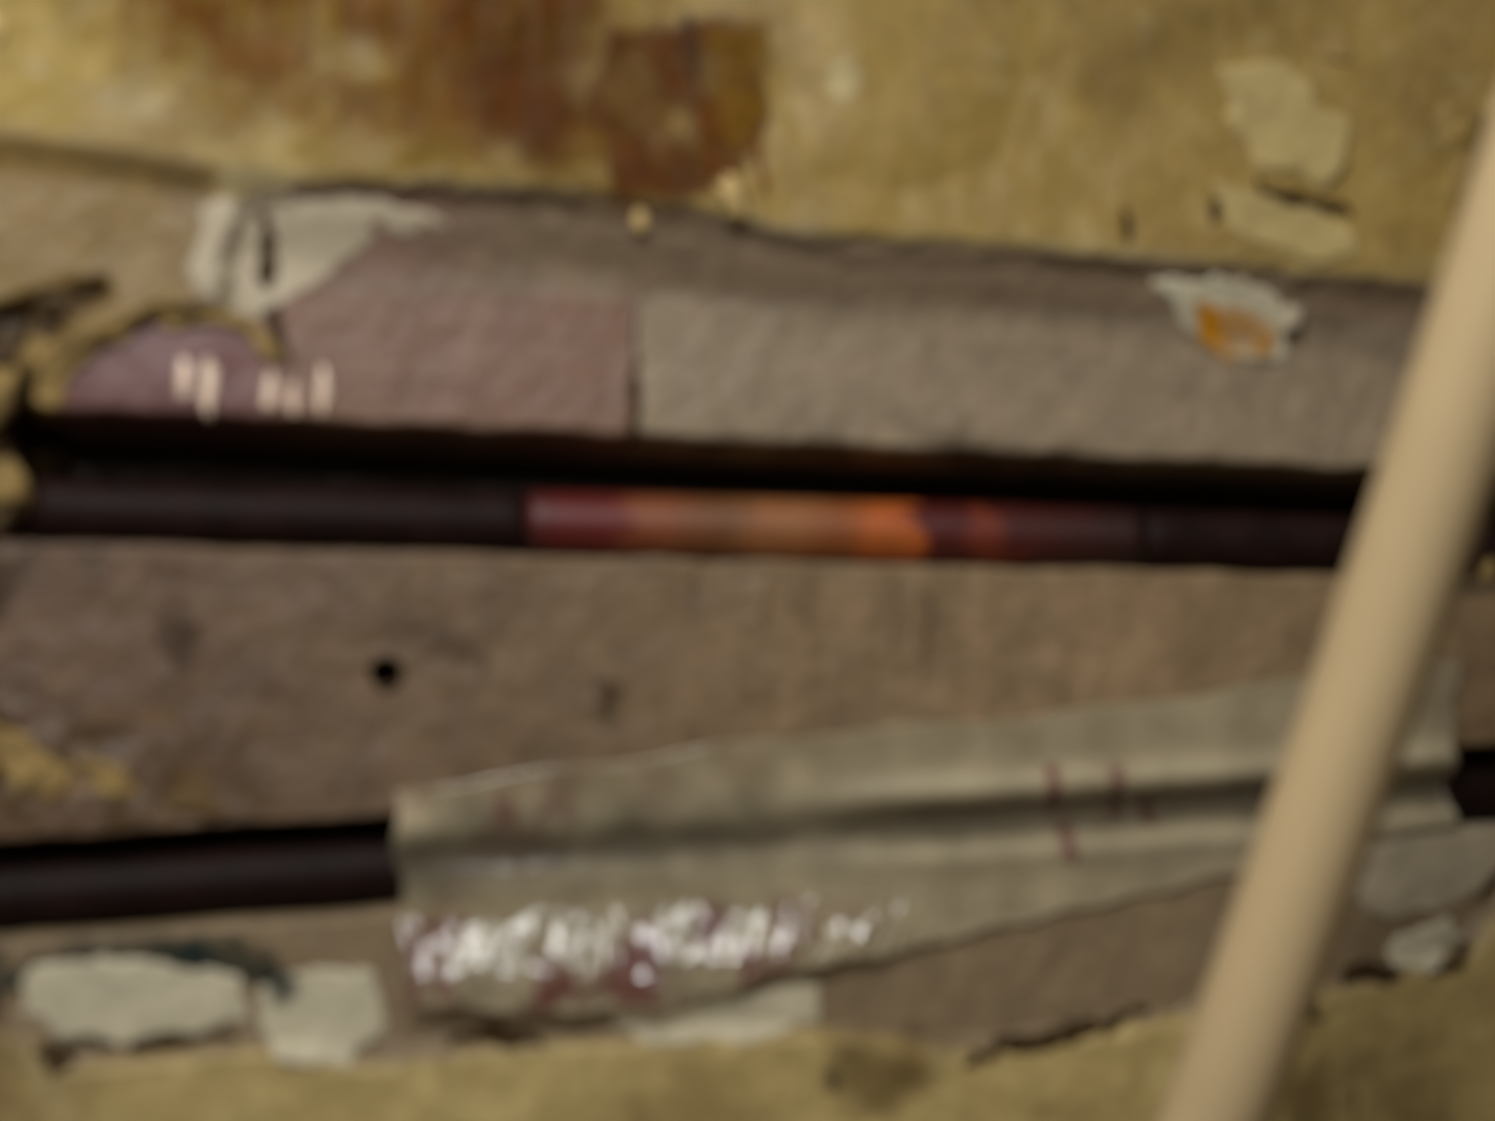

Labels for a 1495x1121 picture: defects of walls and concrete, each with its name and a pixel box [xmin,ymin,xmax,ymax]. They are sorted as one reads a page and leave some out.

flaking render [633,209,647,236]
flaking render [713,173,749,225]
peeling [0,192,450,527]
flaking render [0,726,234,819]
peeling [1352,822,1495,974]
peeling [22,955,387,1068]
peeling [612,981,820,1047]